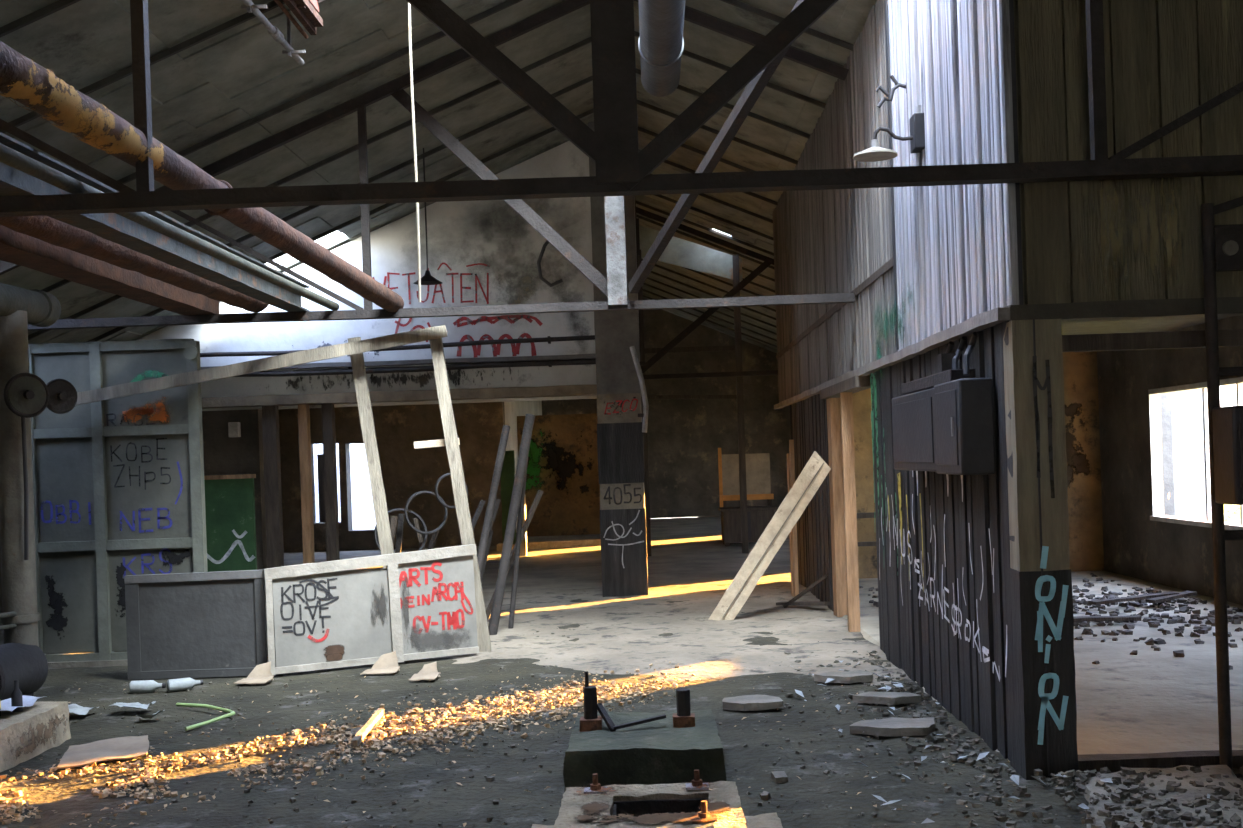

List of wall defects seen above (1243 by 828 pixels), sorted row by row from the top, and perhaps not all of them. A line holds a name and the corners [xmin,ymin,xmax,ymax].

damp [498,264,539,305]